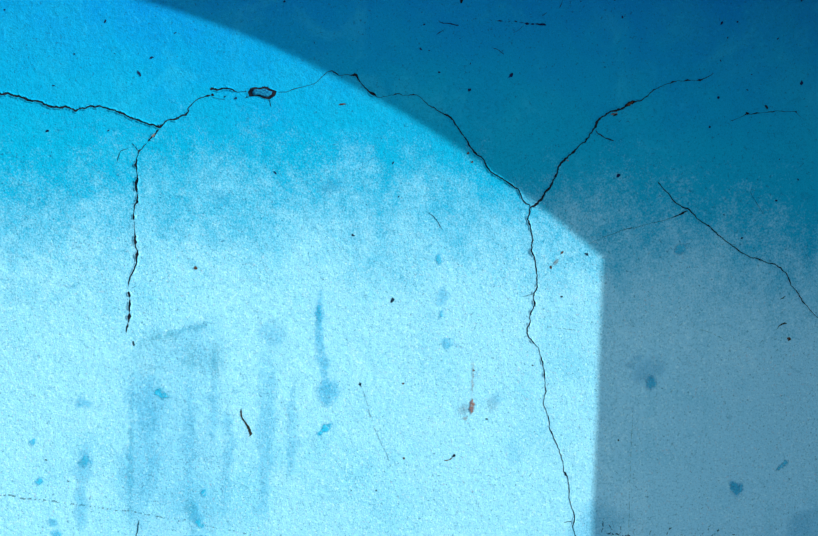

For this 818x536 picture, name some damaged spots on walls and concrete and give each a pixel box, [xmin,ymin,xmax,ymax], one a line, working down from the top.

crack [731,105,797,121]
crack [0,86,246,333]
crack [287,70,712,536]
crack [589,182,818,318]
crack [0,494,251,536]